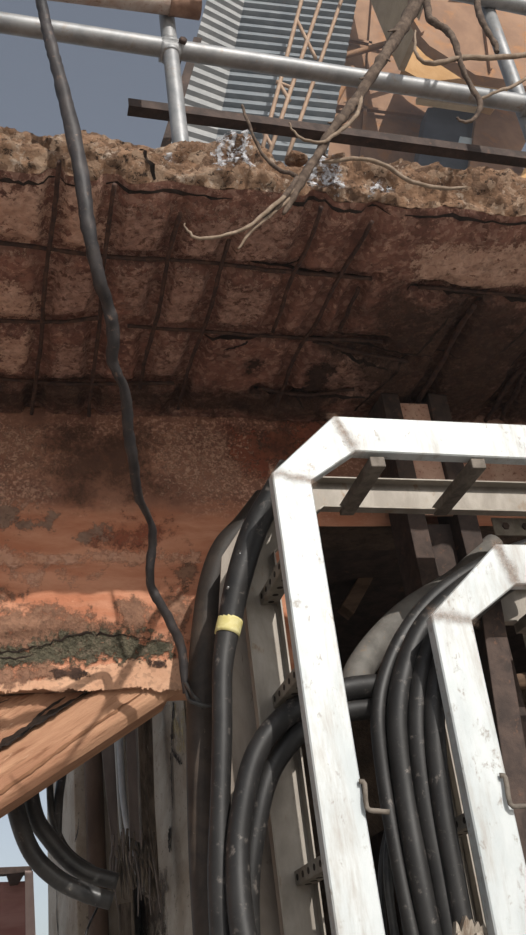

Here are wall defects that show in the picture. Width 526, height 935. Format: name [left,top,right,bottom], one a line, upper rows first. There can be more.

leakage [210,129,256,171]
crack [0,175,75,186]
crack [106,145,231,200]
leakage [307,154,348,197]
crack [293,196,526,226]
spalling [0,126,101,379]
spalling [81,130,526,379]
spalling [294,348,408,407]
peeling [0,496,61,535]
crack [0,631,170,659]
leakage [0,659,86,691]
crack [0,691,141,794]